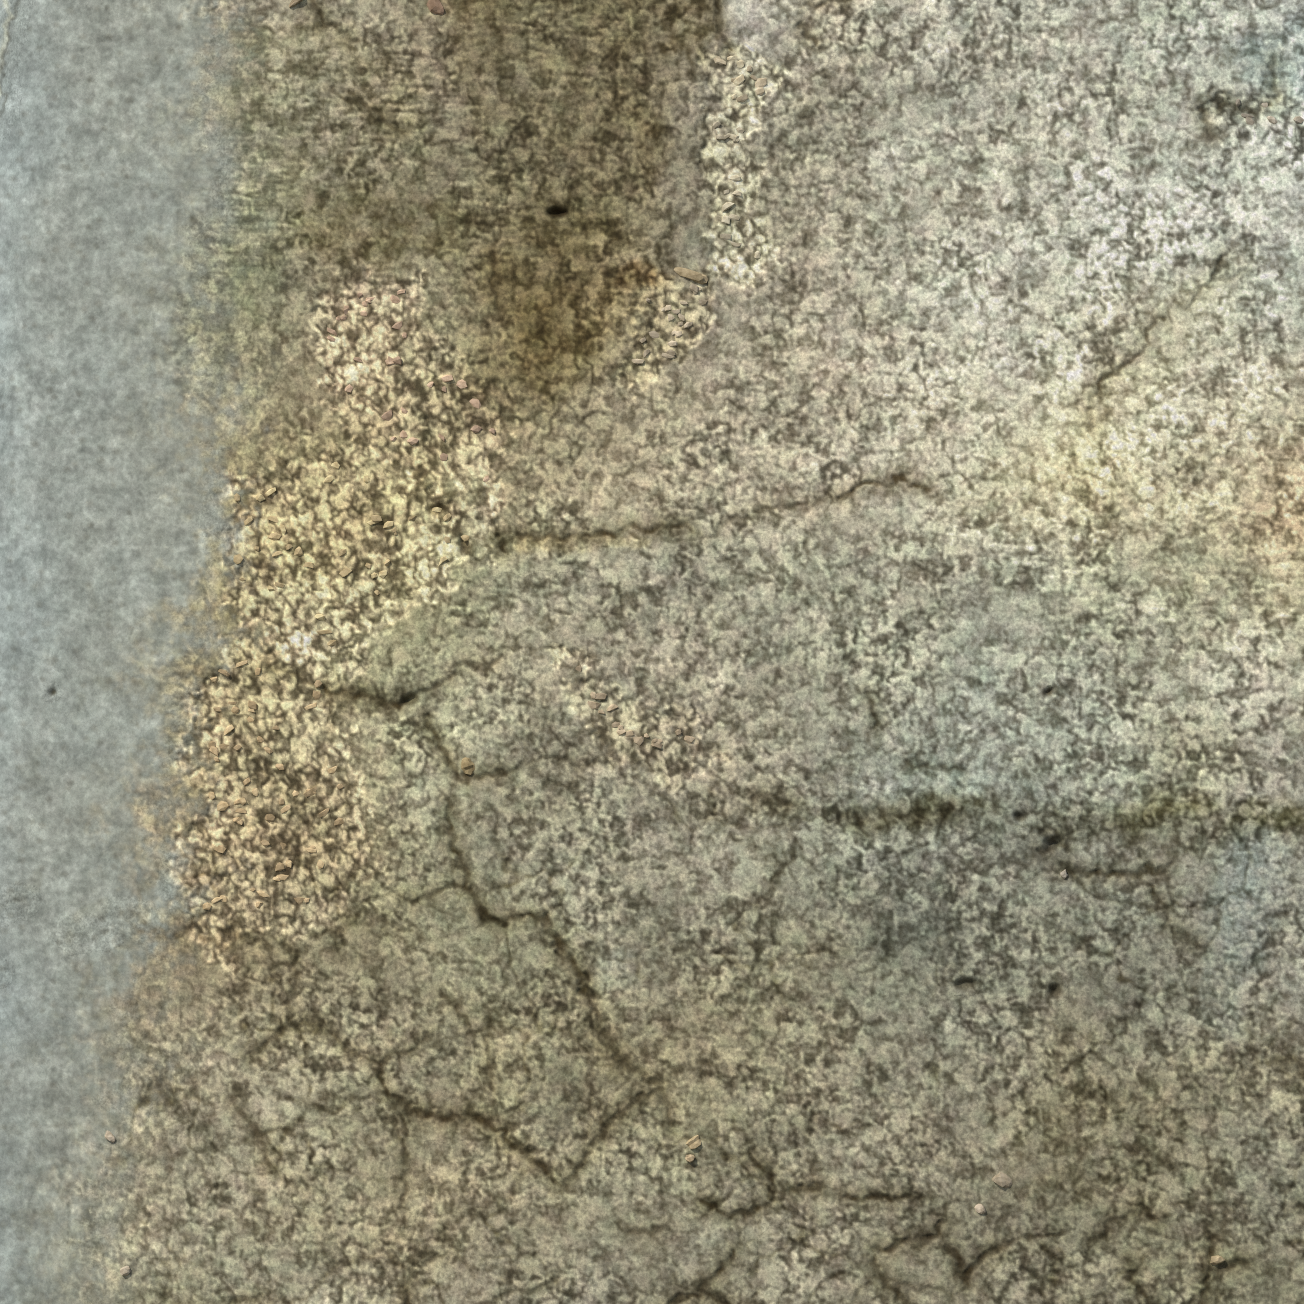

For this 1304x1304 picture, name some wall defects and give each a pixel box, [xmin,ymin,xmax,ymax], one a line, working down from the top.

crack [0,0,35,147]
crack [476,454,951,577]
crack [732,672,983,857]
crack [0,635,692,1304]
crack [1018,819,1224,970]
crack [608,1137,1268,1304]
crack [1276,1185,1304,1232]